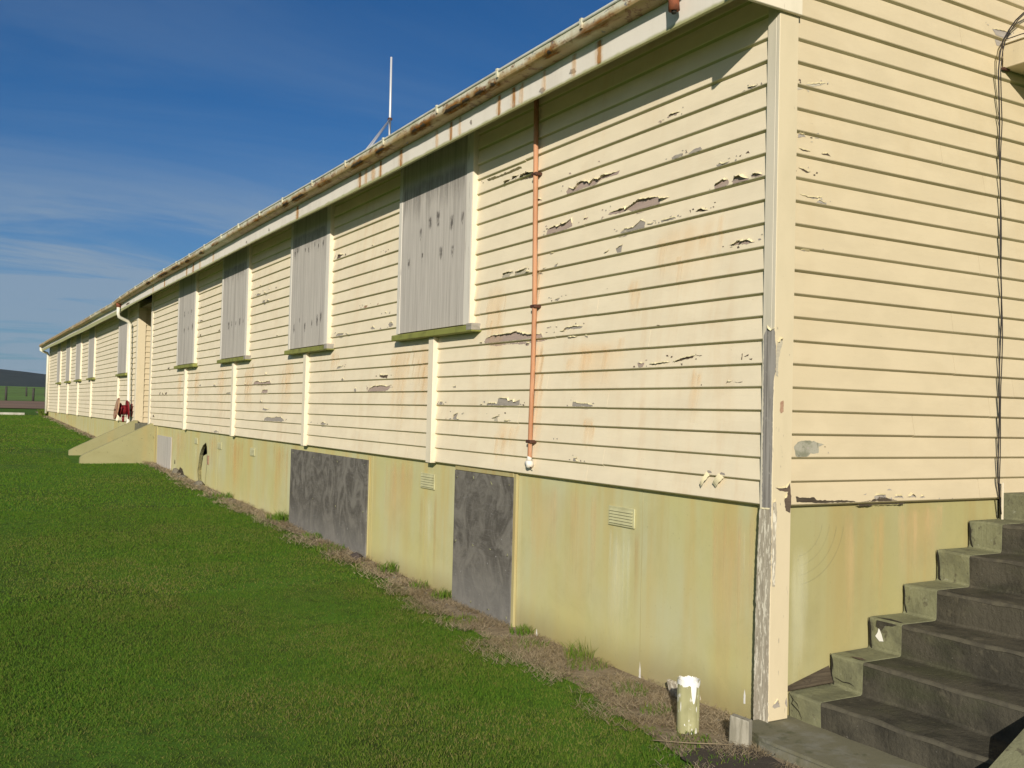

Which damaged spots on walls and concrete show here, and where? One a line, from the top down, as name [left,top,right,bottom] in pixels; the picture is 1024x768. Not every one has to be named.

rust [577,17,607,64]
rust [445,81,515,140]
rust [354,146,402,187]
peeling [561,161,620,194]
peeling [543,217,588,235]
peeling [601,195,716,254]
peeling [479,323,588,346]
peeling [244,373,287,422]
peeling [354,374,392,392]
peeling [480,397,525,421]
peeling [741,325,784,587]
peeling [856,489,924,506]